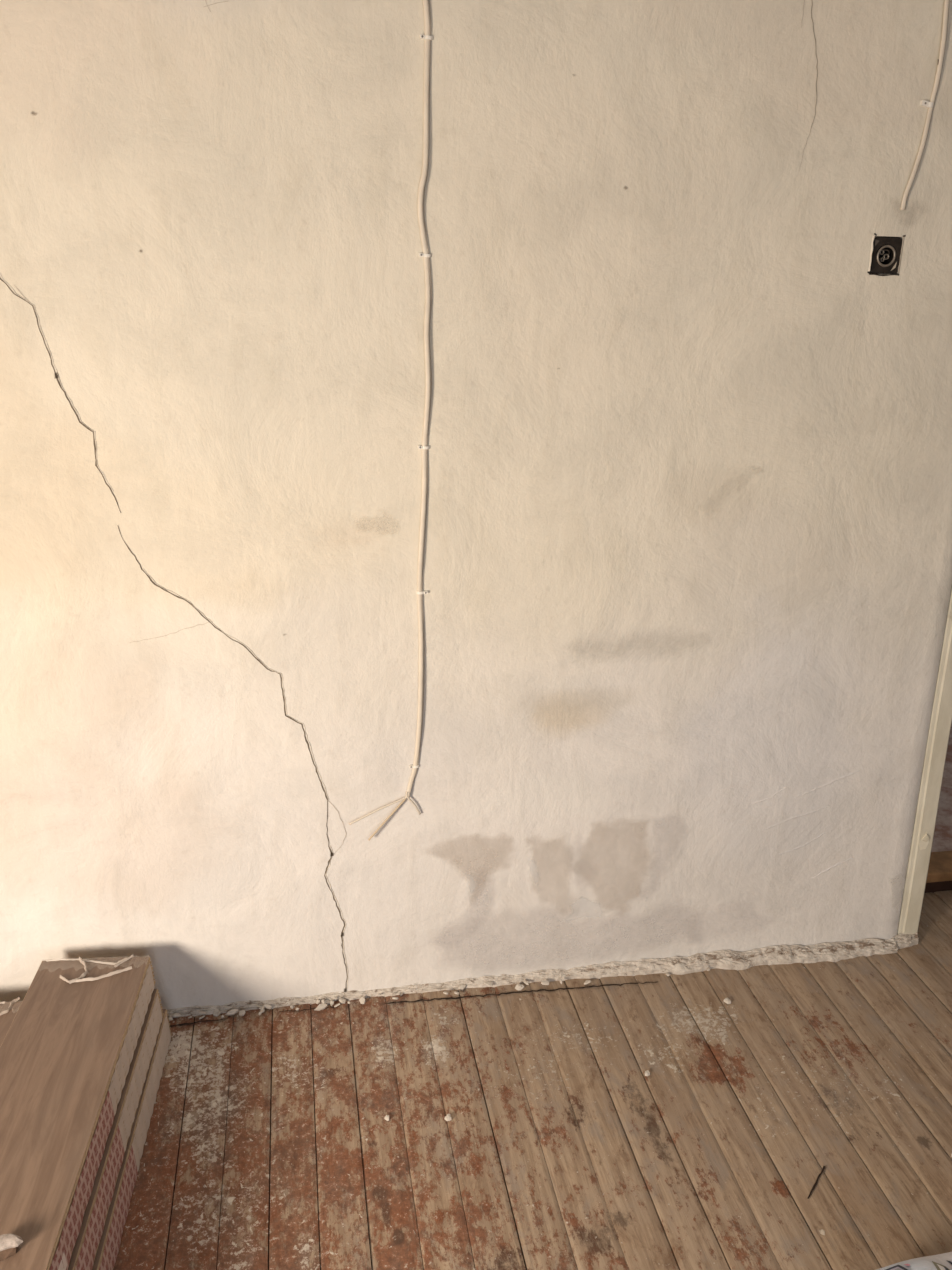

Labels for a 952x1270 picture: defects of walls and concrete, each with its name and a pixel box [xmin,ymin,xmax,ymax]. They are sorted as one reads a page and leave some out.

crack [799,1,818,170]
crack [0,274,348,992]